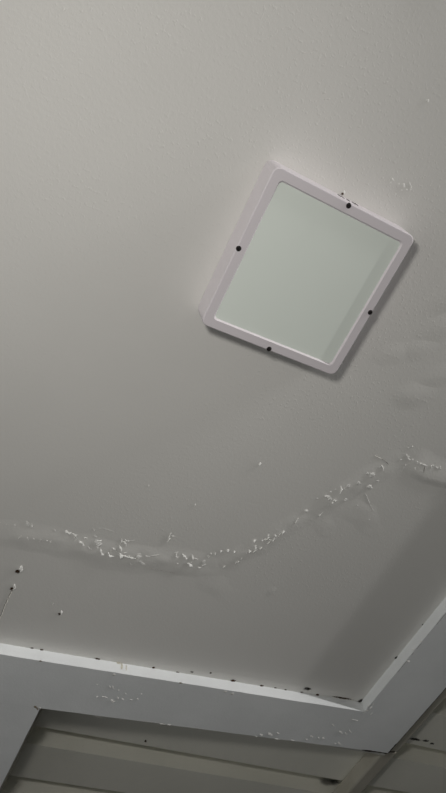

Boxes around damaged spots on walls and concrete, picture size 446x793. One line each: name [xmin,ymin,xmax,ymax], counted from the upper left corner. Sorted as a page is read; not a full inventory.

peeling [54,528,159,565]
peeling [175,531,285,568]